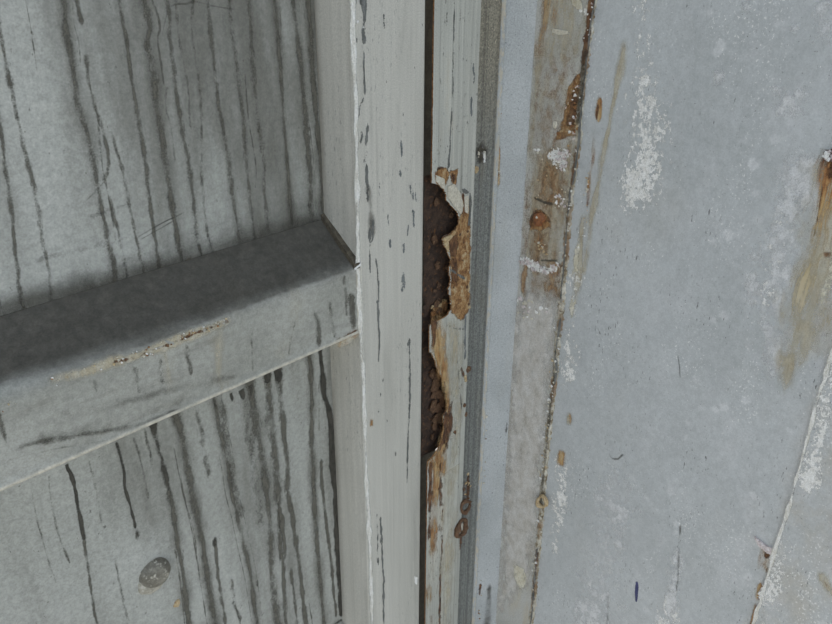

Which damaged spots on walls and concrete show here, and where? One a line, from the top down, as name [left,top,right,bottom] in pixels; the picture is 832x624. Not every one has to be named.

peeling [429,368,447,440]
corrosion [426,146,472,624]
peeling [447,314,471,417]
corrosion [521,0,581,295]
corrosion [575,47,625,293]
corrosion [779,149,832,384]